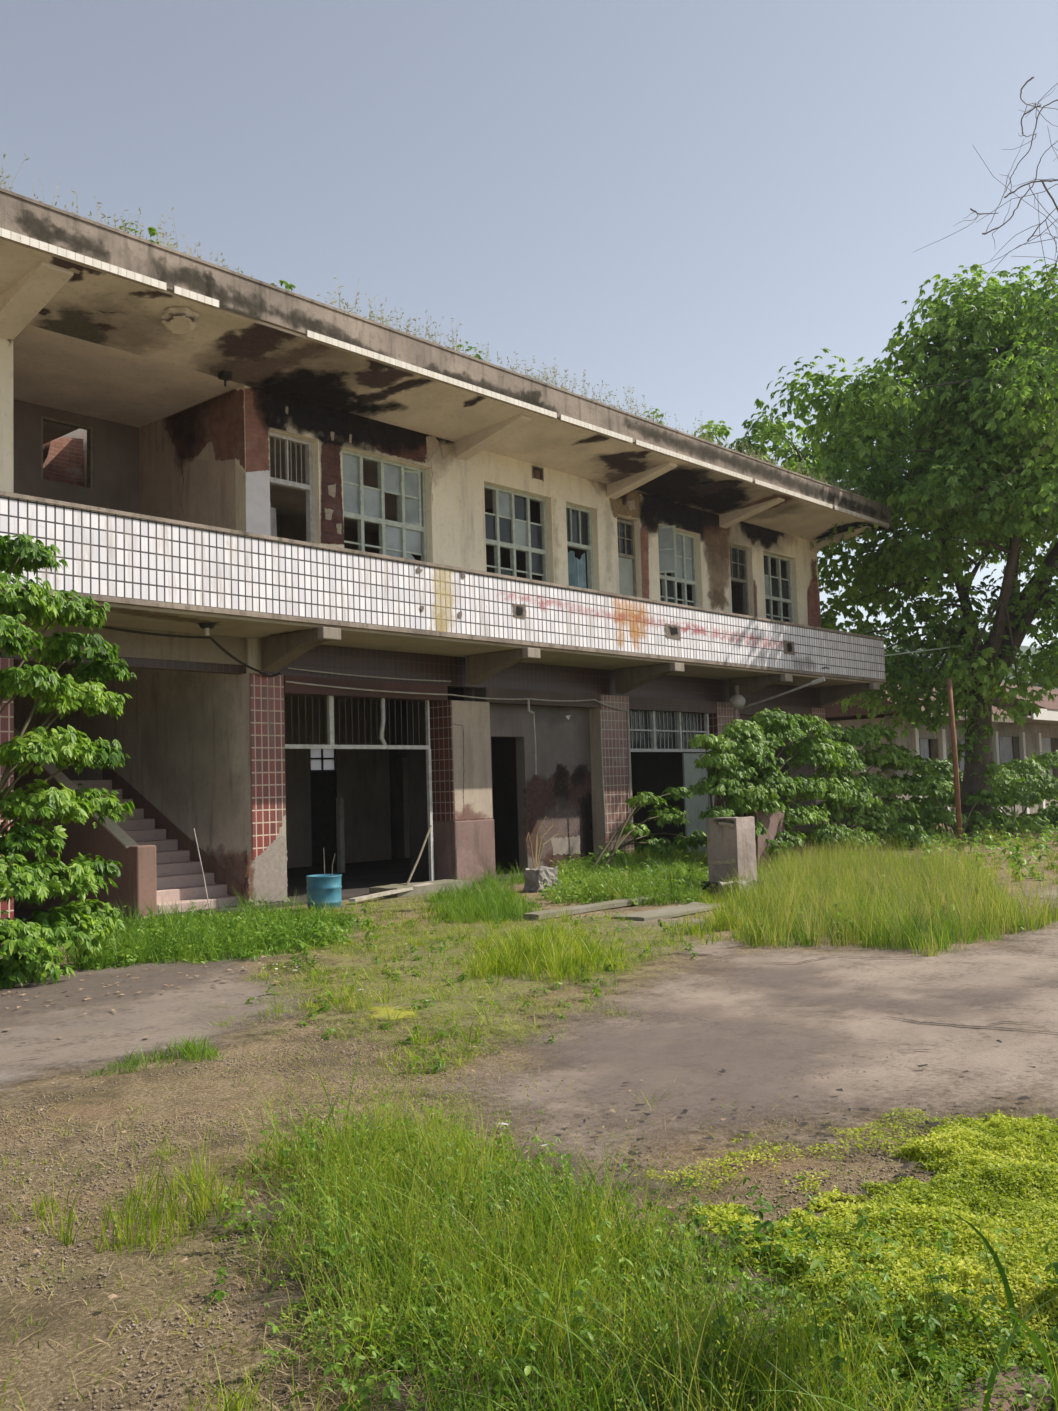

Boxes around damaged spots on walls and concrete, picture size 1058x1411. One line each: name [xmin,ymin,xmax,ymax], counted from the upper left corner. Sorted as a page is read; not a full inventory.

water stain [41,310,107,344]
spalling [165,324,327,472]
spalling [375,436,451,463]
water stain [626,420,886,539]